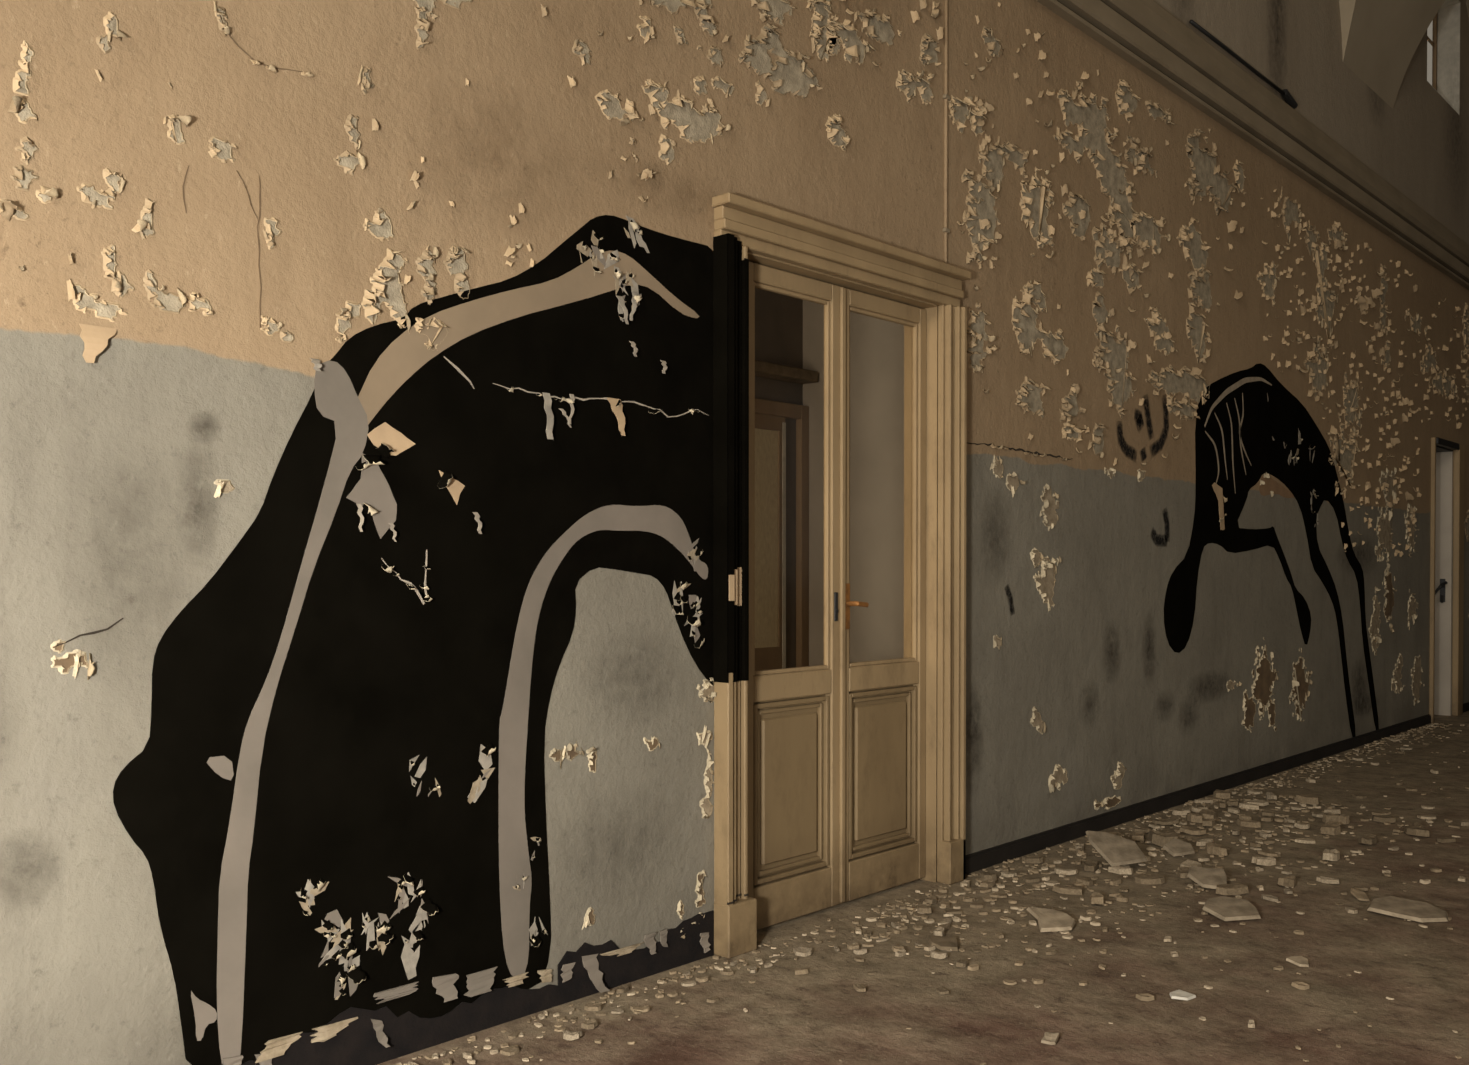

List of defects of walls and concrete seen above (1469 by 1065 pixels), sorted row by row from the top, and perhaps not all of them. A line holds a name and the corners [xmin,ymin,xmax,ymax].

peeling [0,40,126,221]
peeling [67,244,213,363]
peeling [335,156,470,351]
peeling [577,216,650,357]
peeling [595,0,1469,656]
peeling [536,392,575,440]
peeling [346,422,415,542]
peeling [437,470,482,534]
peeling [409,755,441,797]
peeling [468,743,496,804]
peeling [191,991,217,1041]
spalling [221,870,813,1065]